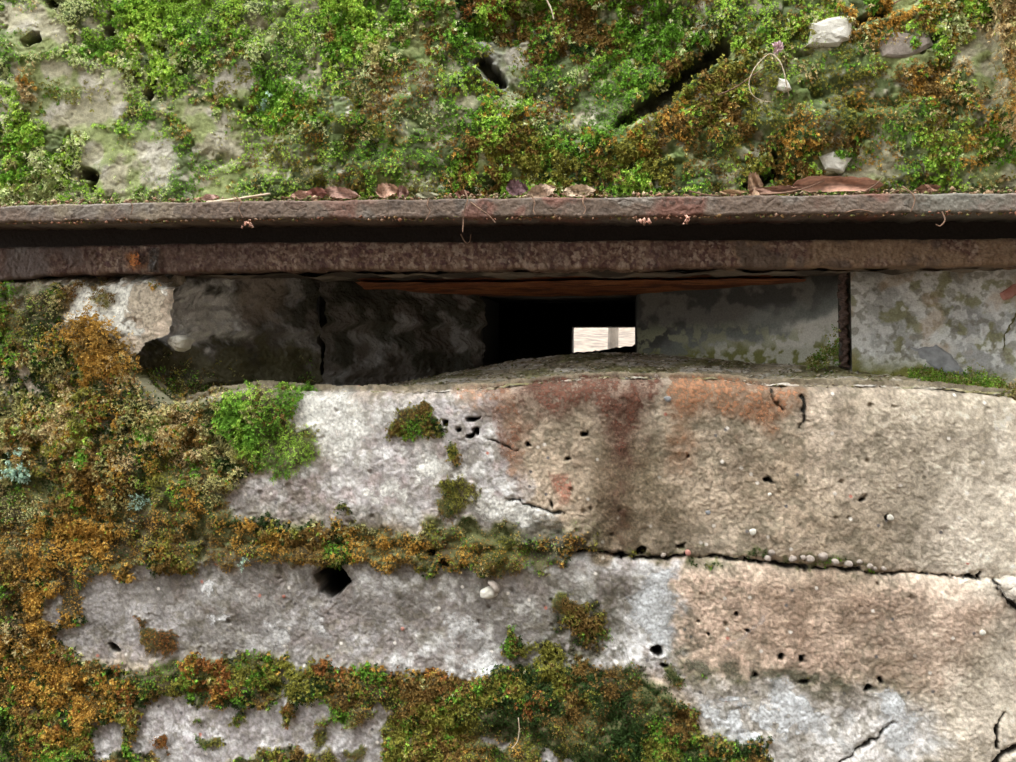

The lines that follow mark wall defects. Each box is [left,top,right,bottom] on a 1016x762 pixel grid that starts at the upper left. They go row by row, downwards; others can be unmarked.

rust [837,273,851,367]
rust [456,374,800,461]
crack [577,548,1016,609]
crack [992,713,1016,762]